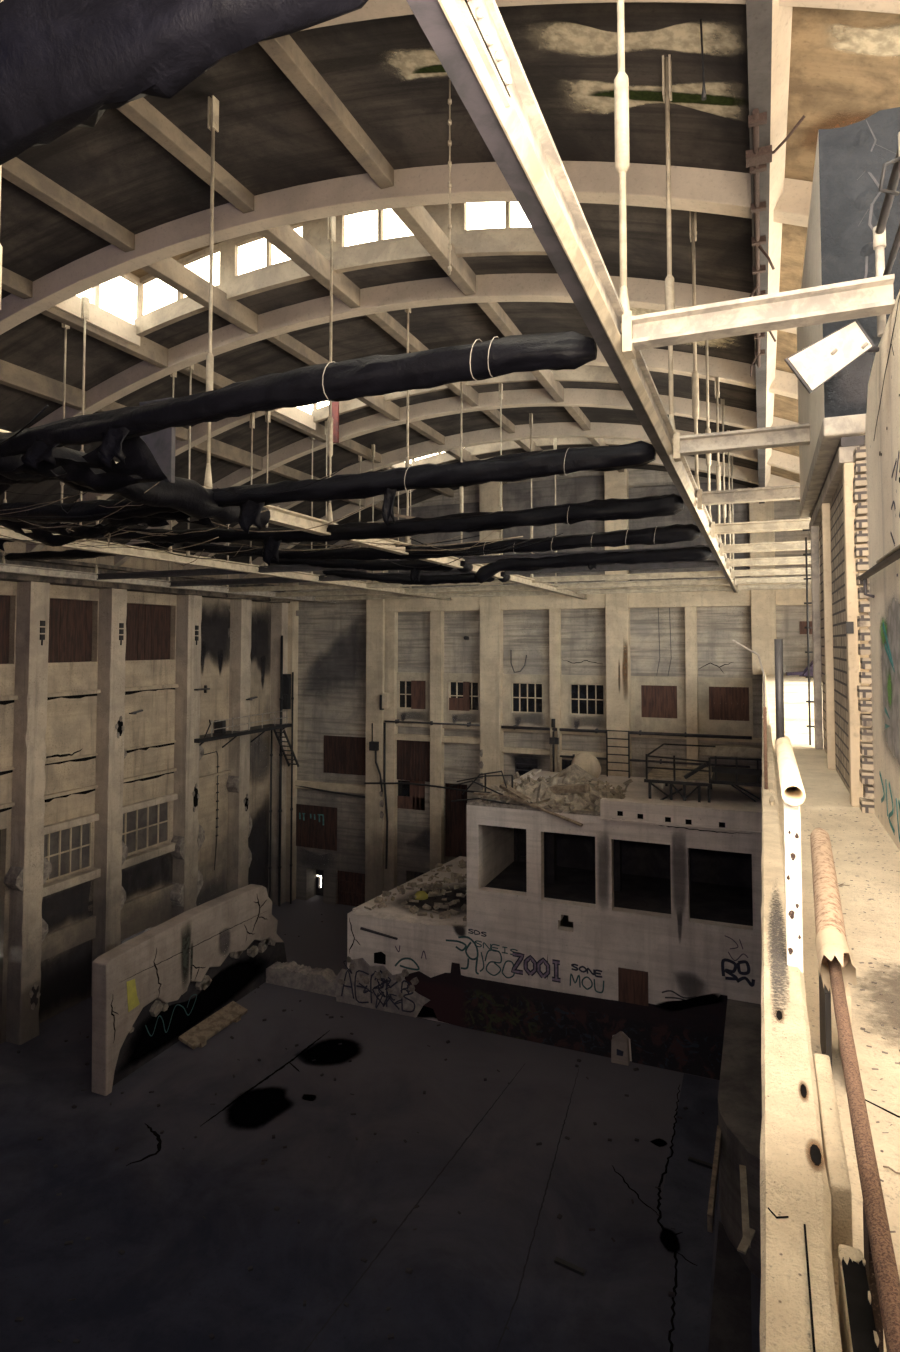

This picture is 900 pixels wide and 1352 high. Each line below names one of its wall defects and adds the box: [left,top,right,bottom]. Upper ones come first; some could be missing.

efflorescence [543,23,739,56]
efflorescence [570,80,743,118]
water stain [201,606,230,673]
water stain [250,611,271,688]
crack [111,896,267,1043]
crack [126,1123,162,1166]
crack [612,1085,697,1352]